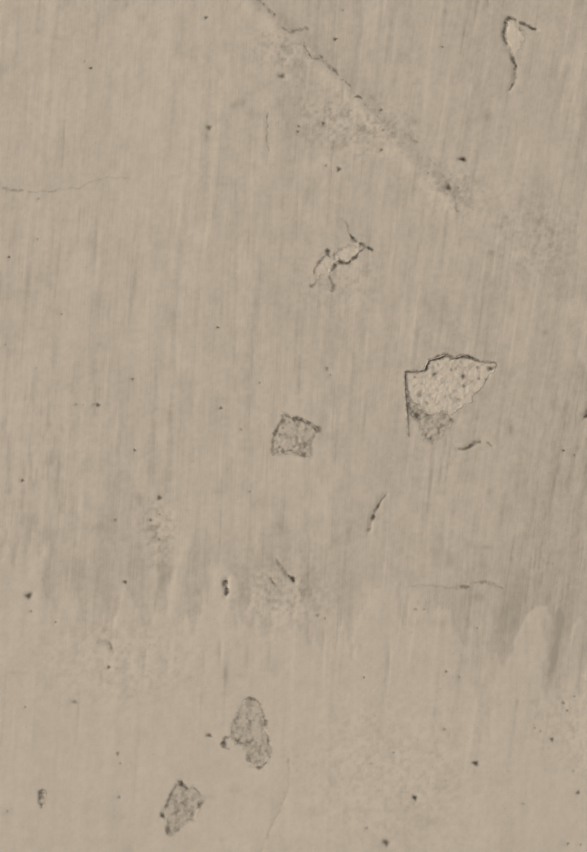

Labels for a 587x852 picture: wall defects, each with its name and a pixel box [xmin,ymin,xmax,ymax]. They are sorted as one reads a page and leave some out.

peeling [506,22,526,54]
spalling [314,230,372,278]
spalling [398,349,497,441]
spalling [272,407,321,457]